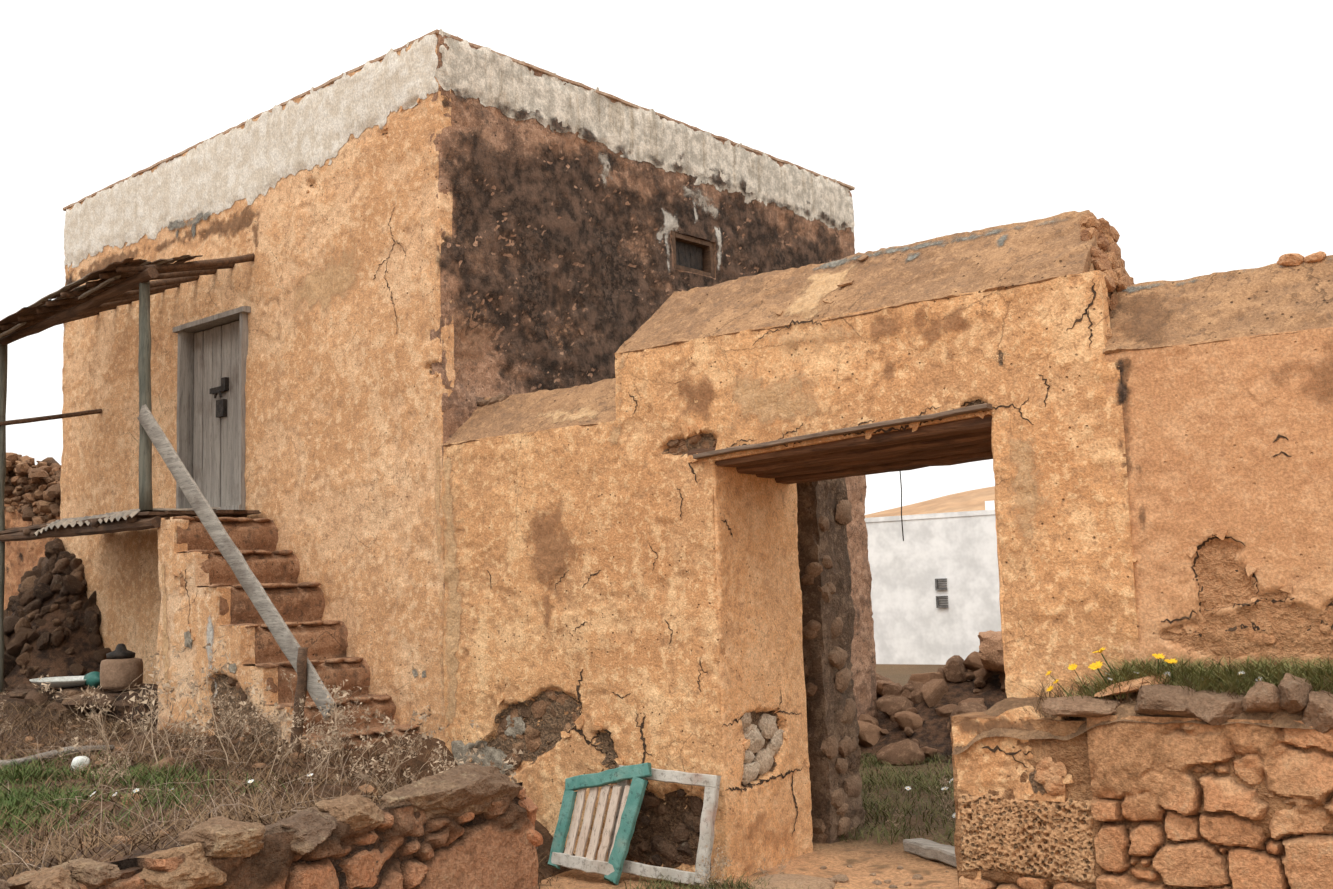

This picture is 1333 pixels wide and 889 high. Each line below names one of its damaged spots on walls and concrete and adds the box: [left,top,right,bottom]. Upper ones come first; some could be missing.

crack [373,207,405,335]
leakage [437,105,846,406]
crack [1066,280,1096,348]
spalling [662,422,717,482]
leakage [679,378,713,417]
leakage [528,510,571,625]
spalling [1161,530,1333,673]
spalling [741,711,790,786]